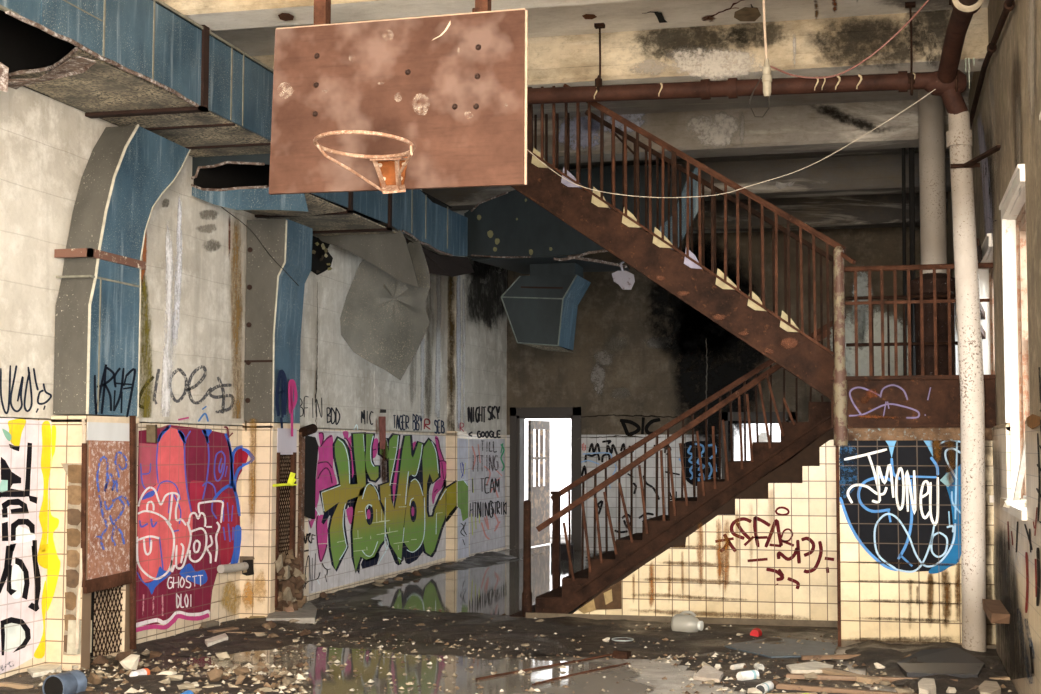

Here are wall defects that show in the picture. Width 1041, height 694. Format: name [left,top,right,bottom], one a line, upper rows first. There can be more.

water stain [814,10,950,91]
water stain [198,210,220,251]
water stain [140,199,182,418]
rust [229,218,256,517]
rust [932,440,954,485]
rust [242,582,253,607]
rust [910,567,961,627]